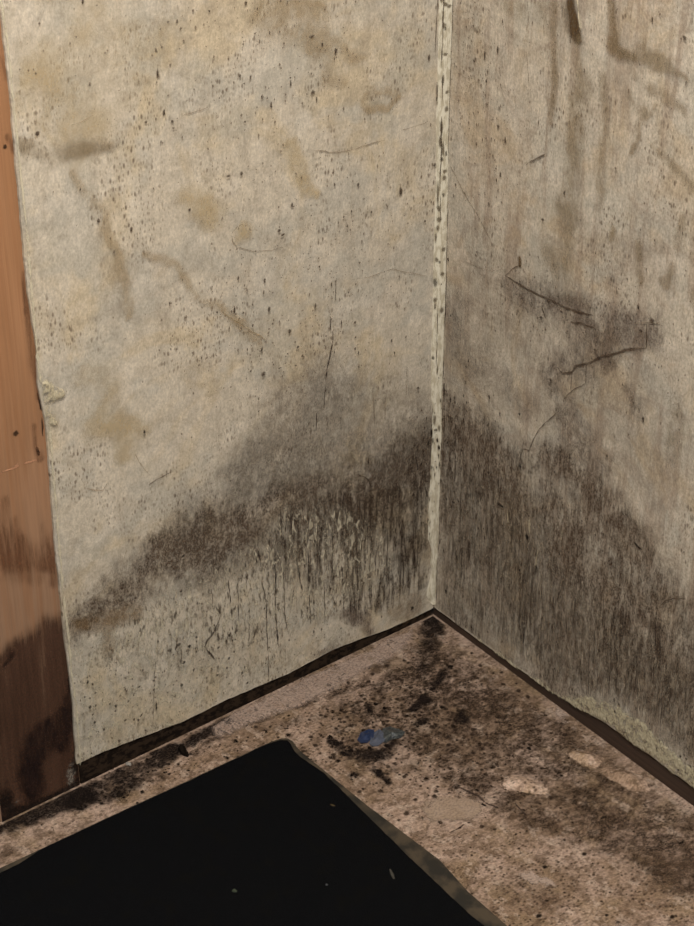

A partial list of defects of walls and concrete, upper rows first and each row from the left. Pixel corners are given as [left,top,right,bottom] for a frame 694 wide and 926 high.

damp [444,2,516,146]
damp [566,0,581,44]
damp [602,0,663,69]
damp [426,124,457,286]
crack [469,263,594,328]
damp [500,254,658,372]
crack [557,322,660,393]
damp [0,389,694,892]